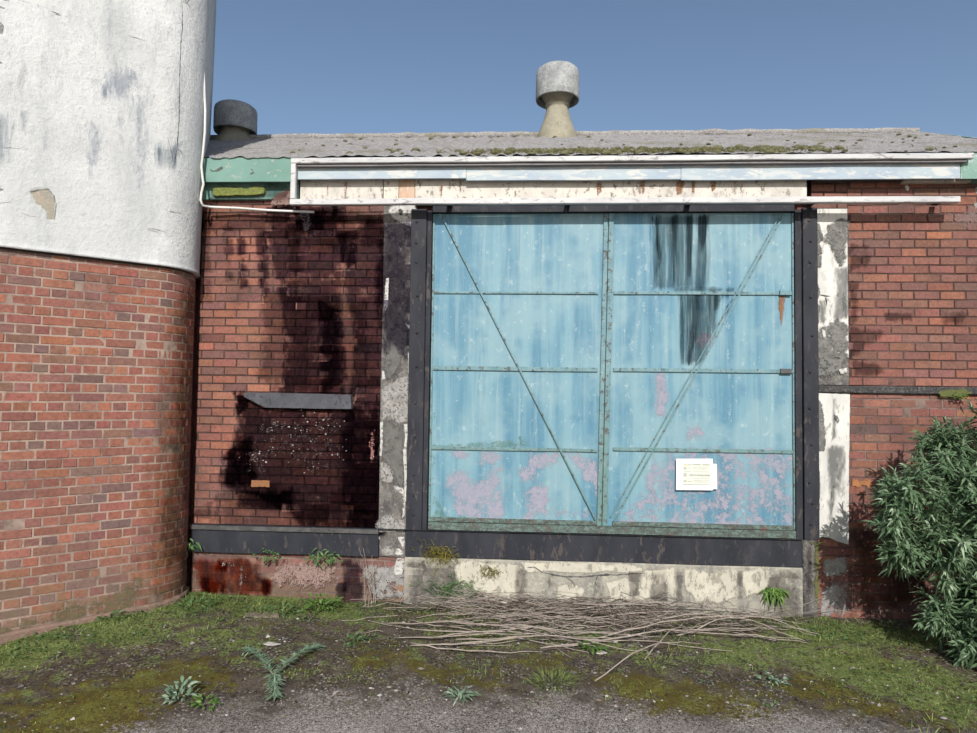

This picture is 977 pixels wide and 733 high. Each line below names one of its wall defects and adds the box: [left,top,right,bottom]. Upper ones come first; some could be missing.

spalling [30,188,56,220]
spalling [817,218,850,267]
spalling [818,286,849,377]
water stain [220,206,411,534]
peeling [654,372,670,418]
spalling [819,401,839,451]
peeling [445,450,508,519]
peeling [517,451,603,520]
peeling [618,426,793,529]
rust [194,558,269,595]
peeling [454,559,771,607]